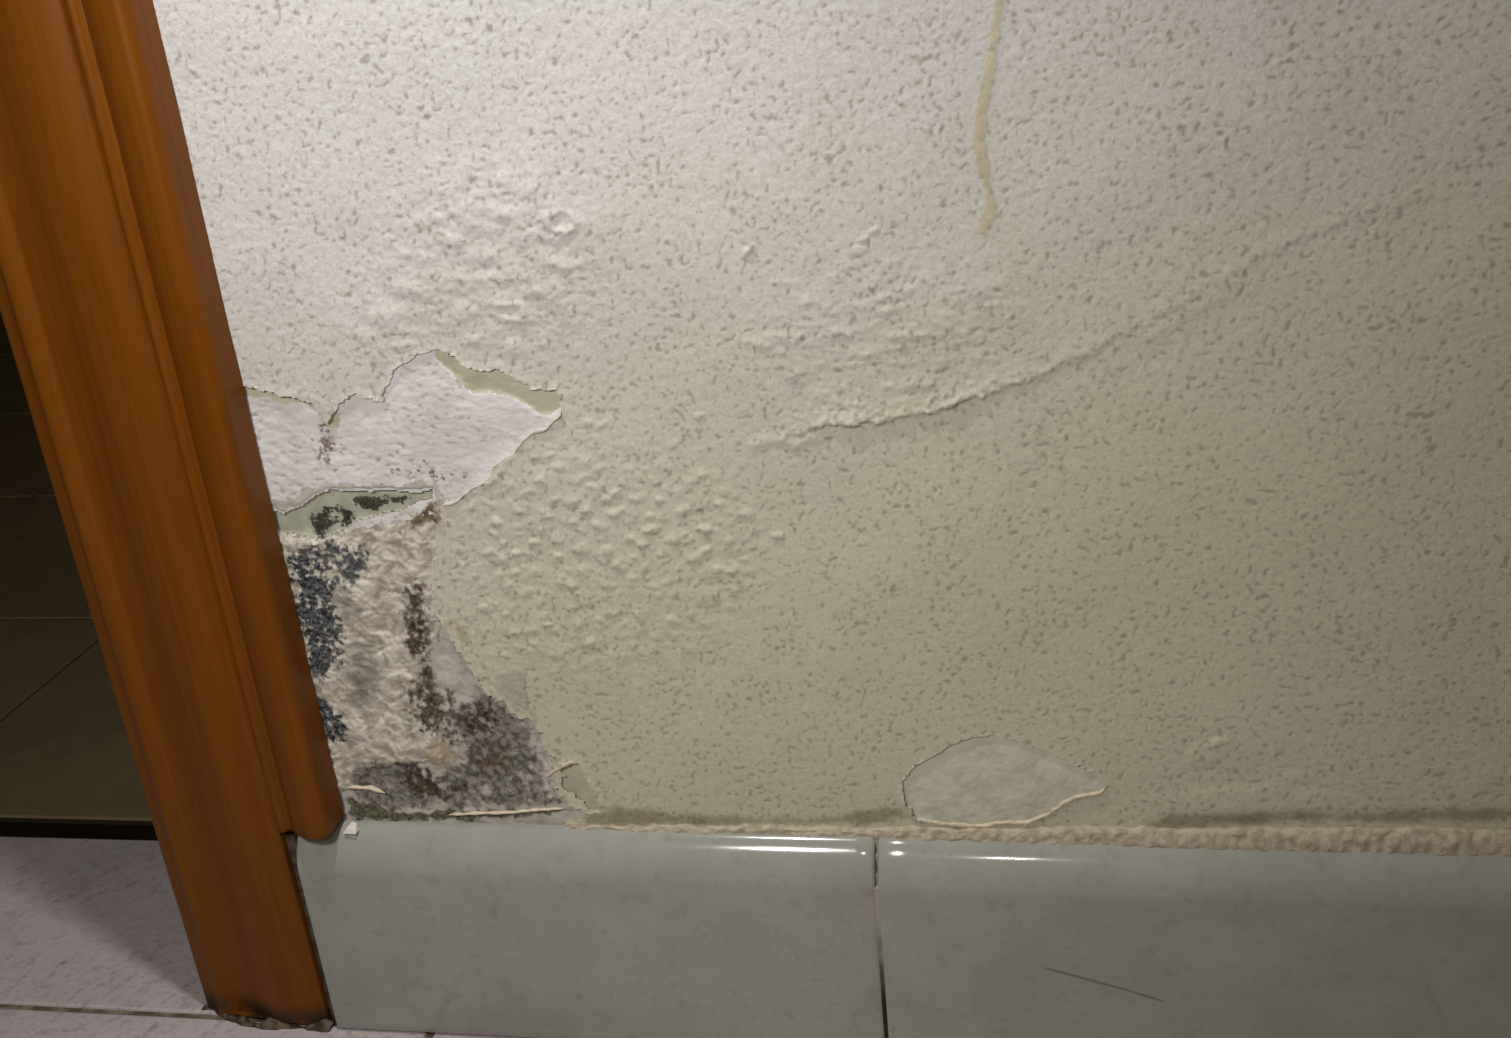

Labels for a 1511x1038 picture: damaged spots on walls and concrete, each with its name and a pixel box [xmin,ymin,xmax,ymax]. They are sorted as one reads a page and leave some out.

damp [311,423,342,464]
damp [286,460,467,743]
spalling [242,342,609,825]
damp [348,579,570,822]